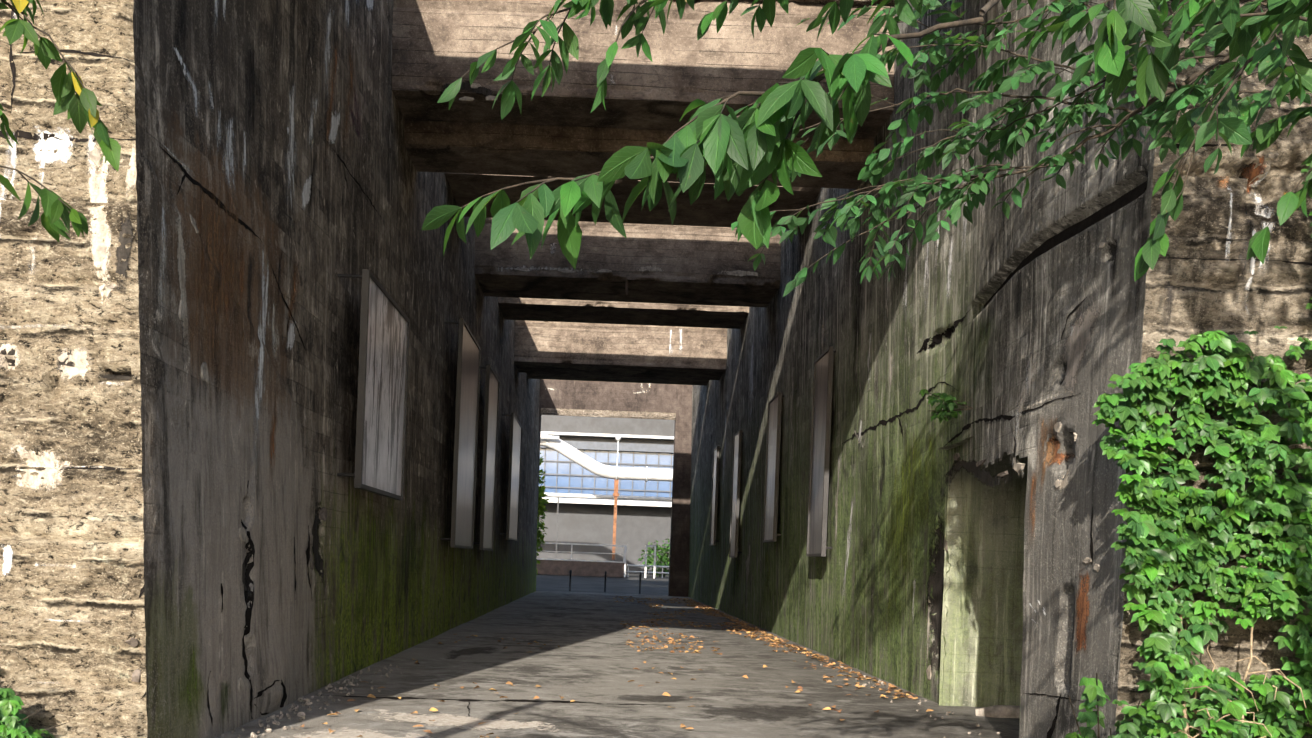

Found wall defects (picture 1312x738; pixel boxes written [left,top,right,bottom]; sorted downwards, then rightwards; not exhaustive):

damp [0,140,17,204]
damp [34,126,73,176]
crack [0,10,308,356]
damp [1226,146,1273,289]
damp [1164,257,1174,325]
crack [916,309,971,354]
crack [840,382,958,445]
crack [944,393,1081,467]
crack [207,480,656,723]
rust [1076,507,1100,652]
crack [1024,693,1083,738]